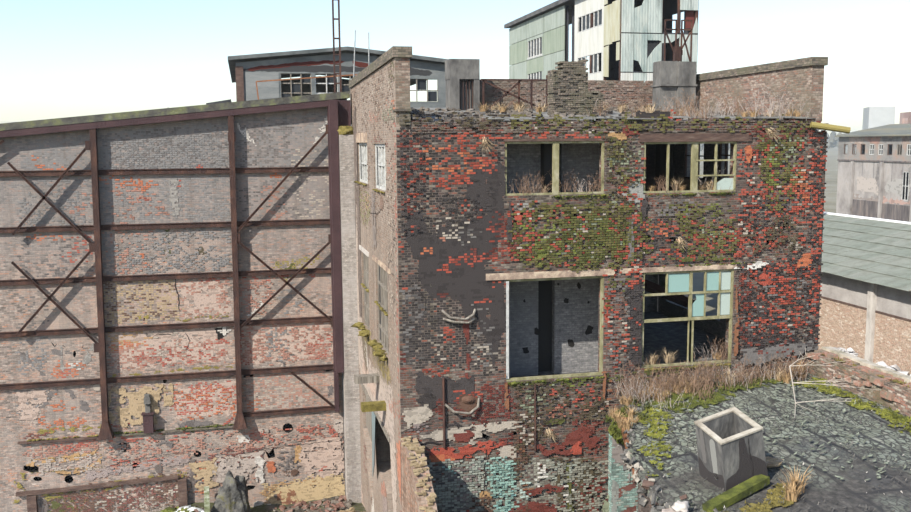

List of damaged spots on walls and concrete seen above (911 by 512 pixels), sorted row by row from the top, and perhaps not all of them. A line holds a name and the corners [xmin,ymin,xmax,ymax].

flaking render [103,213,289,370]
flaking render [352,61,601,425]
flaking render [437,121,827,363]
flaking render [23,321,345,512]
spalling [381,383,718,512]
damp [546,458,606,512]
peeling [760,381,911,480]
spalling [805,349,911,403]